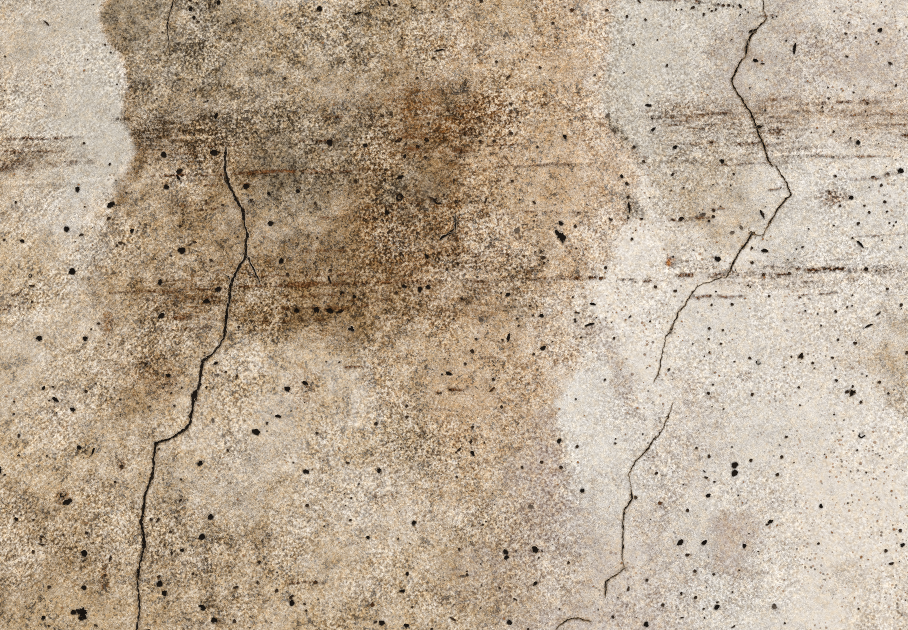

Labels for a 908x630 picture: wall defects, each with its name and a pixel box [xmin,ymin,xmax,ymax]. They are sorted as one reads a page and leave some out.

crack [653,0,792,382]
damp [0,0,585,549]
crack [135,145,261,630]
crack [604,402,673,598]
damp [0,591,122,630]
damp [45,531,90,563]
damp [189,569,266,628]
damp [253,541,303,601]
damp [287,553,449,630]
damp [474,545,542,622]
crack [555,616,591,630]